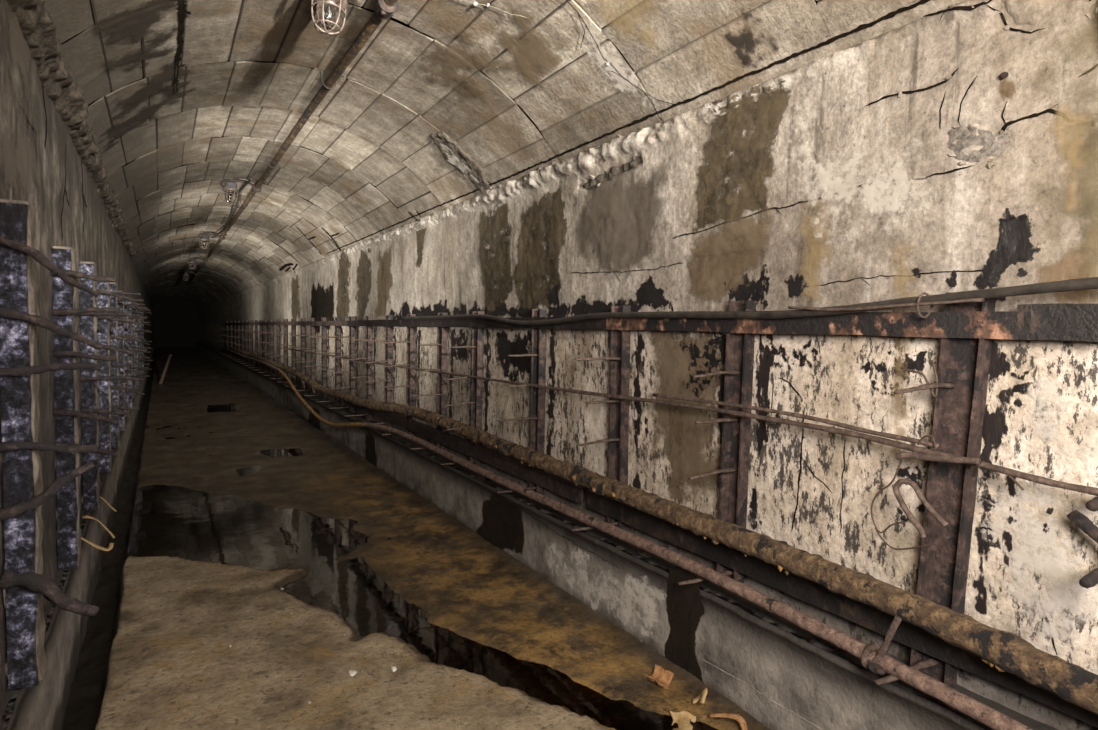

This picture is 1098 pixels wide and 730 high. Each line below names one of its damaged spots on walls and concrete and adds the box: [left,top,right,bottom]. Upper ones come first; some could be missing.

crack [172,0,191,93]
spalling [6,0,136,256]
crack [279,0,1045,279]
damp [578,13,818,309]
damp [793,139,936,244]
crack [993,102,1084,142]
damp [291,132,677,456]
damp [973,208,1041,301]
damp [755,334,823,454]
damp [860,350,936,404]
damp [476,494,524,554]
damp [546,543,704,682]